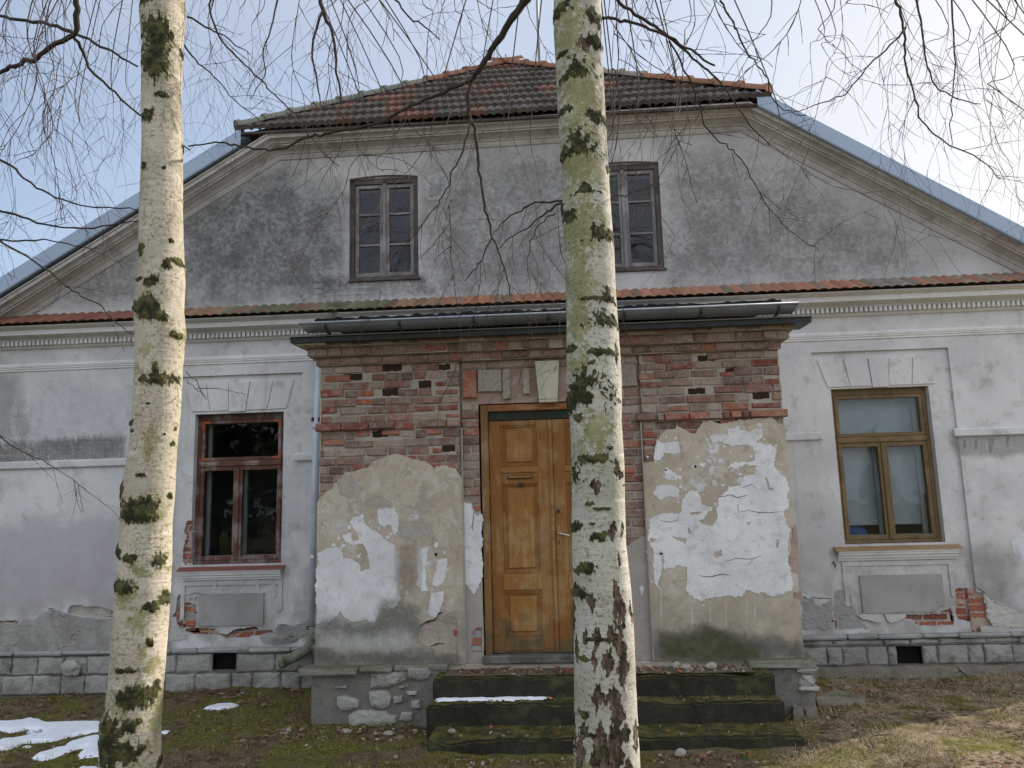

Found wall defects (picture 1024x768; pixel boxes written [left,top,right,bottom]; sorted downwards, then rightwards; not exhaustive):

flaking render [319,358,567,594]
peeling [621,350,1024,632]
peeling [168,499,484,663]
flaking render [0,604,113,652]
water stain [322,604,418,635]
water stain [316,649,459,665]
water stain [656,631,801,660]